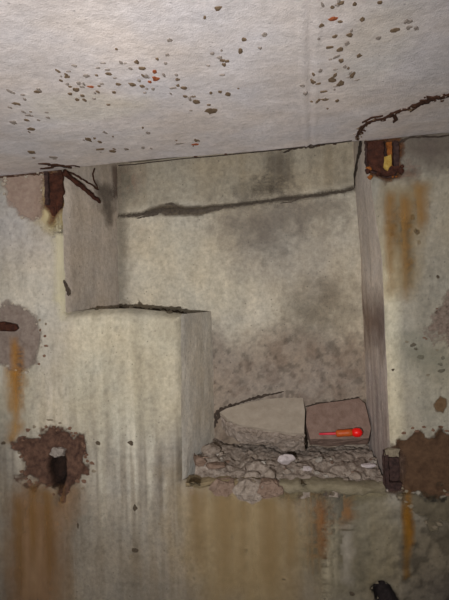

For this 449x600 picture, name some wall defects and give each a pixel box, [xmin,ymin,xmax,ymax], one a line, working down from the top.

peeling [55,59,166,102]
peeling [169,73,218,114]
peeling [300,29,360,110]
crack [118,93,449,219]
corrosion [364,138,413,182]
spalling [1,172,44,221]
corrosion [41,169,101,228]
spalling [0,300,48,374]
crack [119,306,187,314]
crack [214,391,284,428]
spalling [1,419,96,503]
spalling [394,426,449,532]